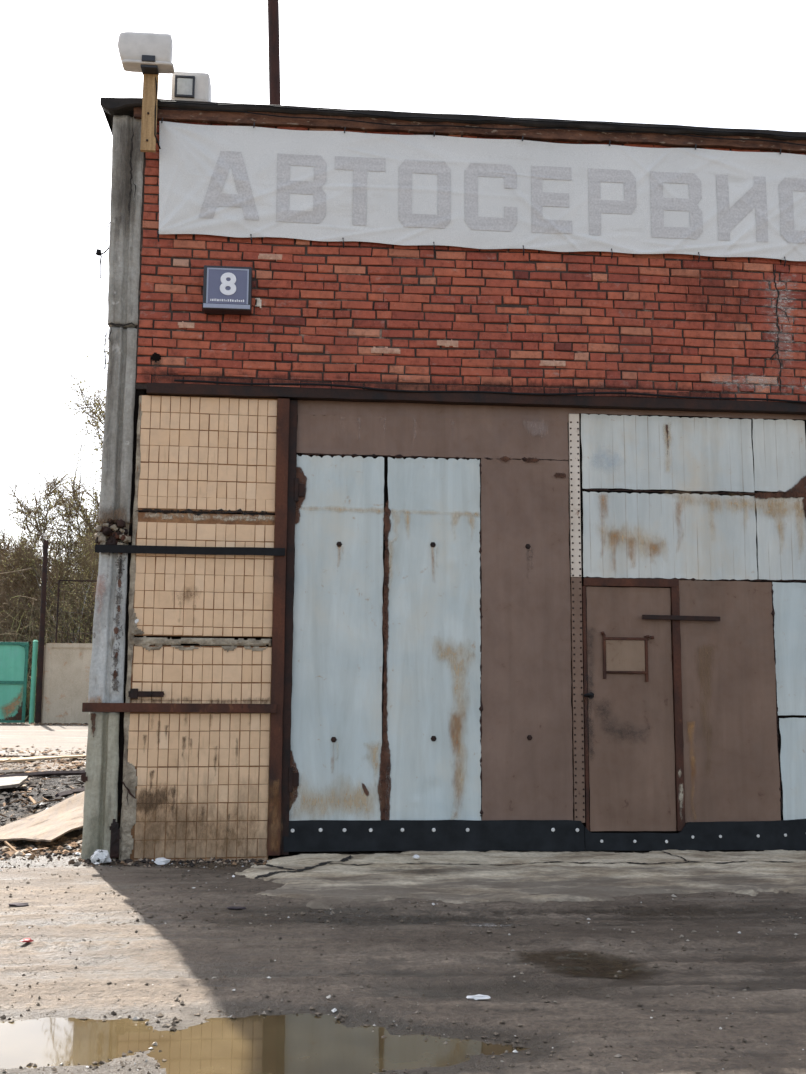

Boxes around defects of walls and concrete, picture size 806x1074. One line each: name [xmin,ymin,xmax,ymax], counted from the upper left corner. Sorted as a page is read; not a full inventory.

crack [770,265,790,395]
corrosion [731,476,806,518]
spalling [111,557,271,692]
corrosion [304,501,391,820]
crack [254,855,375,879]